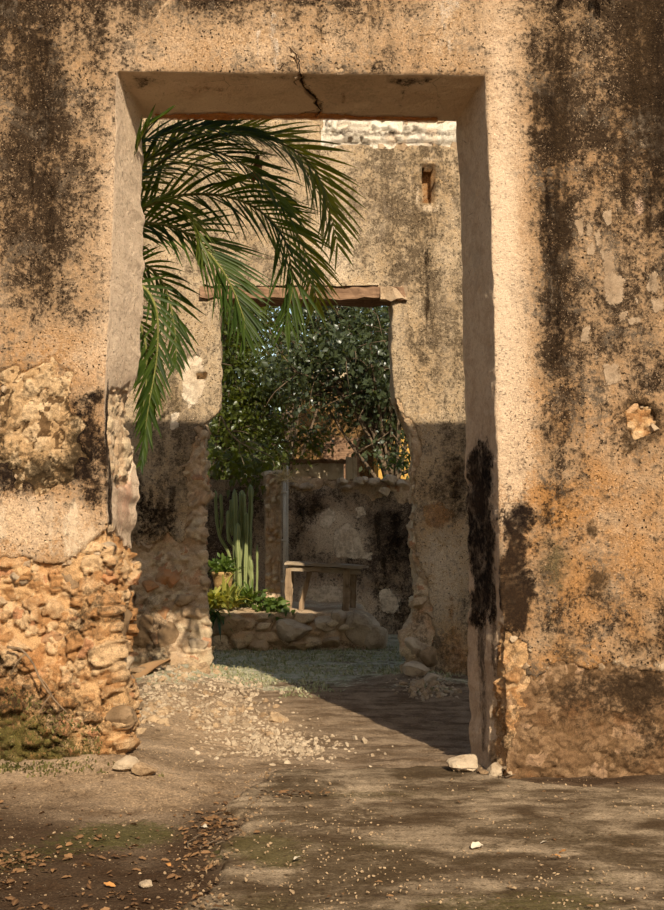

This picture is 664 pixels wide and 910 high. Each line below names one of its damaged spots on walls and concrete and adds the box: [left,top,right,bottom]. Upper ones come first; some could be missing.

crack [277,47,324,117]
leakage [621,0,664,247]
leakage [533,33,570,375]
leakage [0,462,34,497]
peeling [0,357,89,535]
leakage [65,383,154,537]
spalling [106,382,134,489]
leakage [619,397,664,462]
spalling [625,403,660,440]
spalling [0,424,215,760]
leakage [587,570,610,597]
spalling [489,625,664,779]